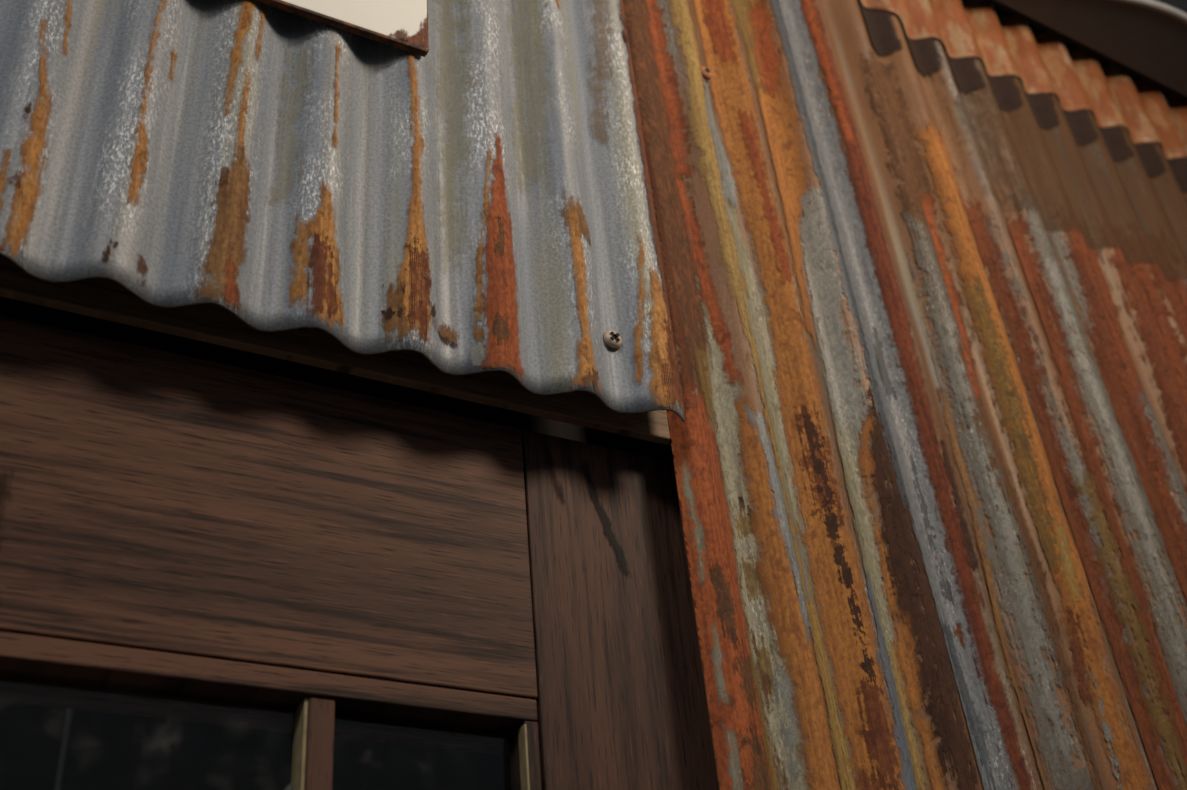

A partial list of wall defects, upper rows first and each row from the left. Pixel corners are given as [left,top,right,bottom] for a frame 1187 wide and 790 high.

corrosion [0,18,53,258]
corrosion [138,256,148,286]
corrosion [127,0,167,205]
corrosion [195,0,267,309]
corrosion [287,180,344,326]
corrosion [333,44,341,147]
corrosion [381,18,432,341]
corrosion [474,133,524,381]
corrosion [561,190,601,388]
corrosion [619,0,779,790]
corrosion [693,0,906,790]
corrosion [800,0,1187,790]